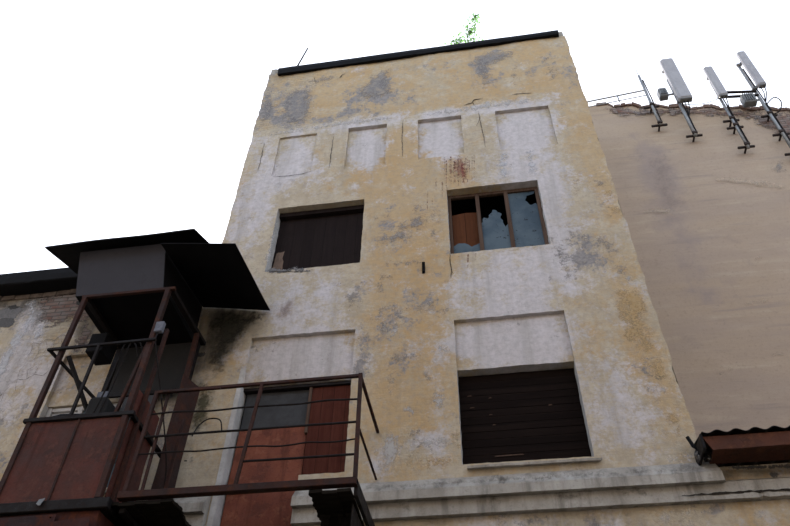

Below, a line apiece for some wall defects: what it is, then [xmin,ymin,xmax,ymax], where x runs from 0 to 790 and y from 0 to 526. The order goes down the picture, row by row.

flaking render [610,107,790,137]
flaking render [0,305,22,327]
flaking render [37,294,91,355]